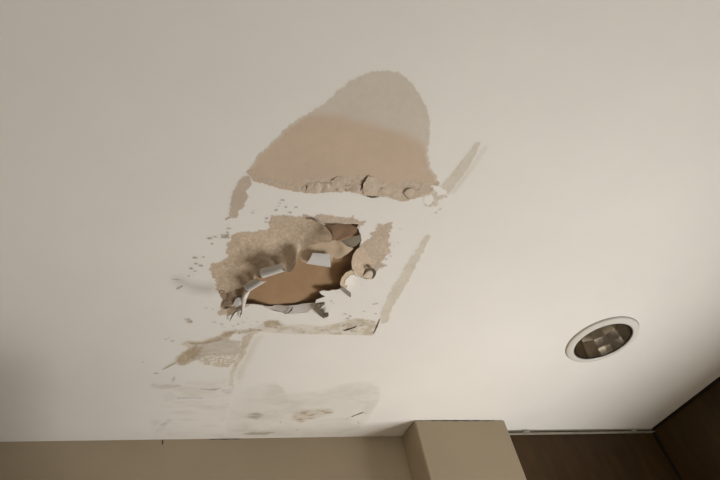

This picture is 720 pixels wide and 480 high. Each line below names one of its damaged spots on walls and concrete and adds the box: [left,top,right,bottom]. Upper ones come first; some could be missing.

damp [247,69,491,202]
peeling [205,175,255,245]
peeling [351,221,401,285]
peeling [153,323,240,374]